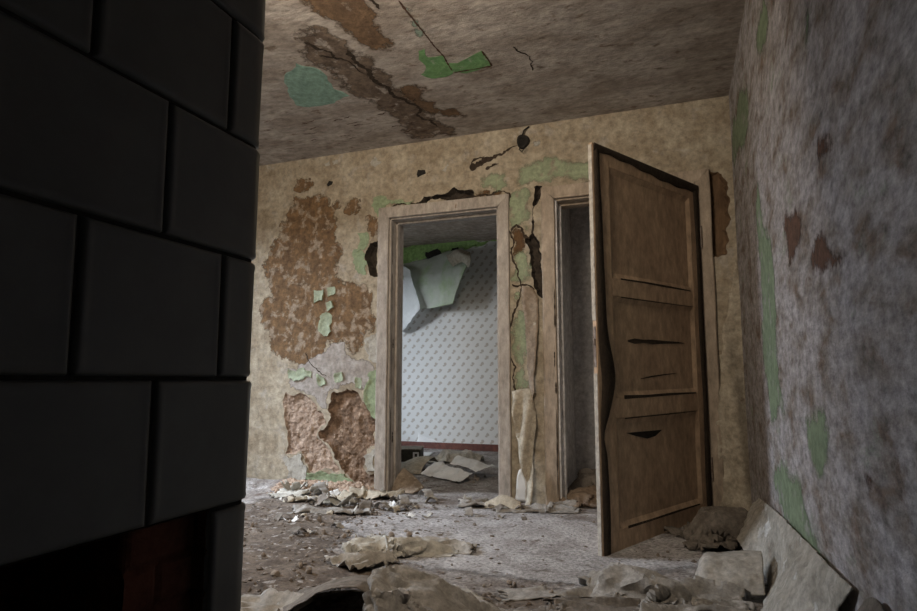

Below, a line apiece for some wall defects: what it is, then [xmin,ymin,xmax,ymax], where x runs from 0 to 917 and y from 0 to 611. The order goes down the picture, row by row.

peeling [284,64,349,107]
peeling [419,49,491,79]
crack [469,146,515,171]
peeling [352,232,378,277]
crack [454,190,535,332]
peeling [314,286,336,336]
crack [509,358,517,391]
spalling [283,367,376,486]